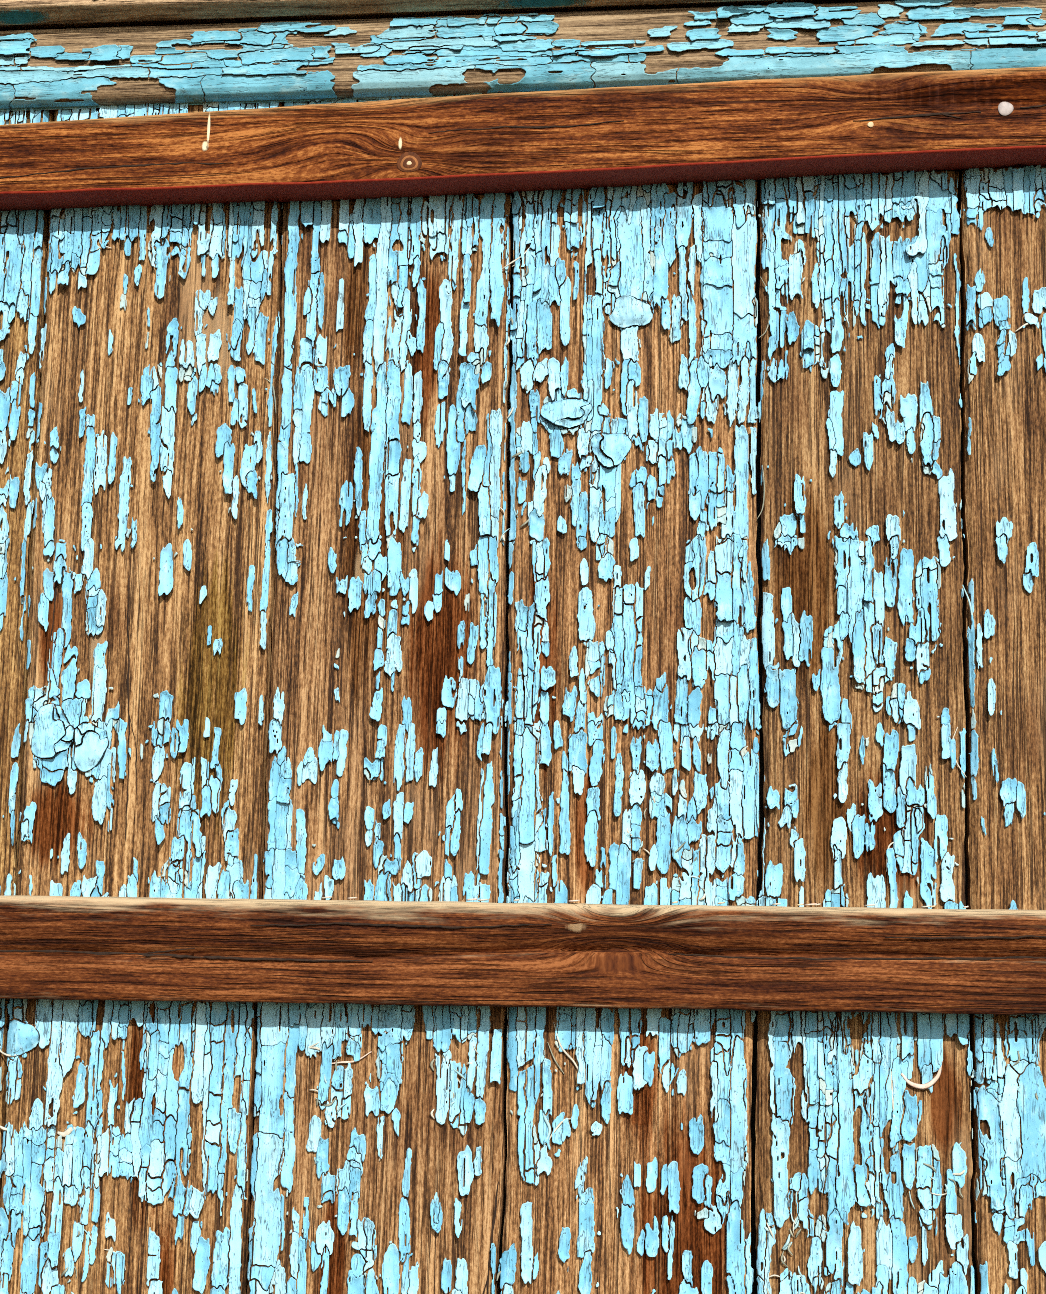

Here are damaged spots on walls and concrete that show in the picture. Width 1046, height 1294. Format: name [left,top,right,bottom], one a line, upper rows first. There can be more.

peeling [0,0,1046,125]
peeling [0,165,1046,909]
peeling [0,998,1046,1294]